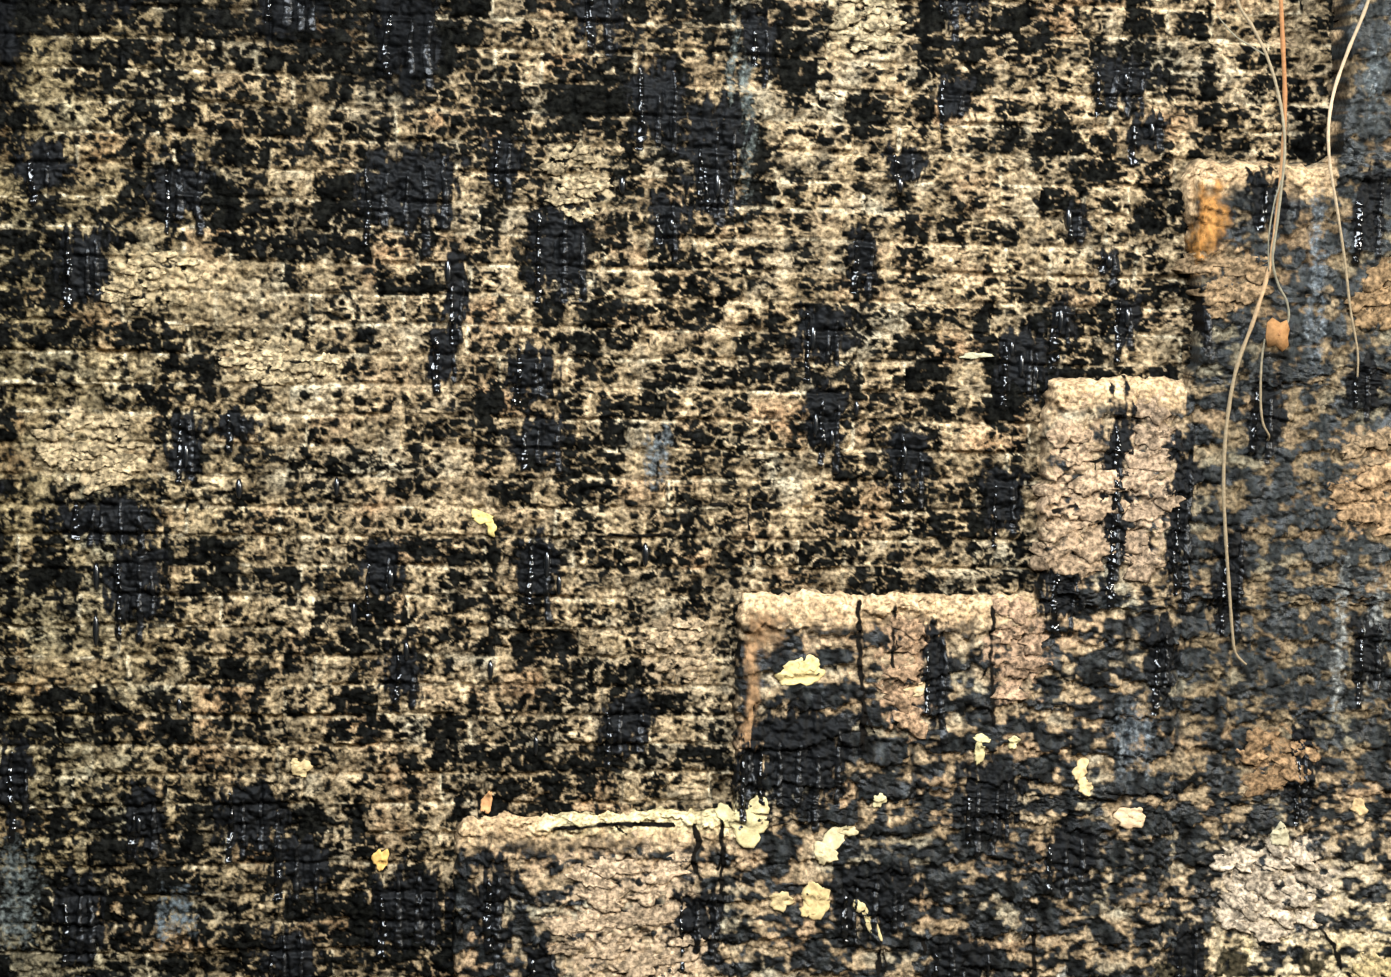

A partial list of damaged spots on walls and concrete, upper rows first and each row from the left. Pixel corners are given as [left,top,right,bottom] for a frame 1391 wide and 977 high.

damp [252,0,334,43]
damp [560,219,588,303]
spalling [1028,389,1186,588]
flaking render [774,654,825,686]
spalling [872,615,931,742]
spalling [982,594,1054,705]
damp [738,731,843,833]
flaking render [872,793,887,808]
flaking render [973,733,991,766]
flaking render [1007,736,1021,749]
spalling [540,829,712,977]